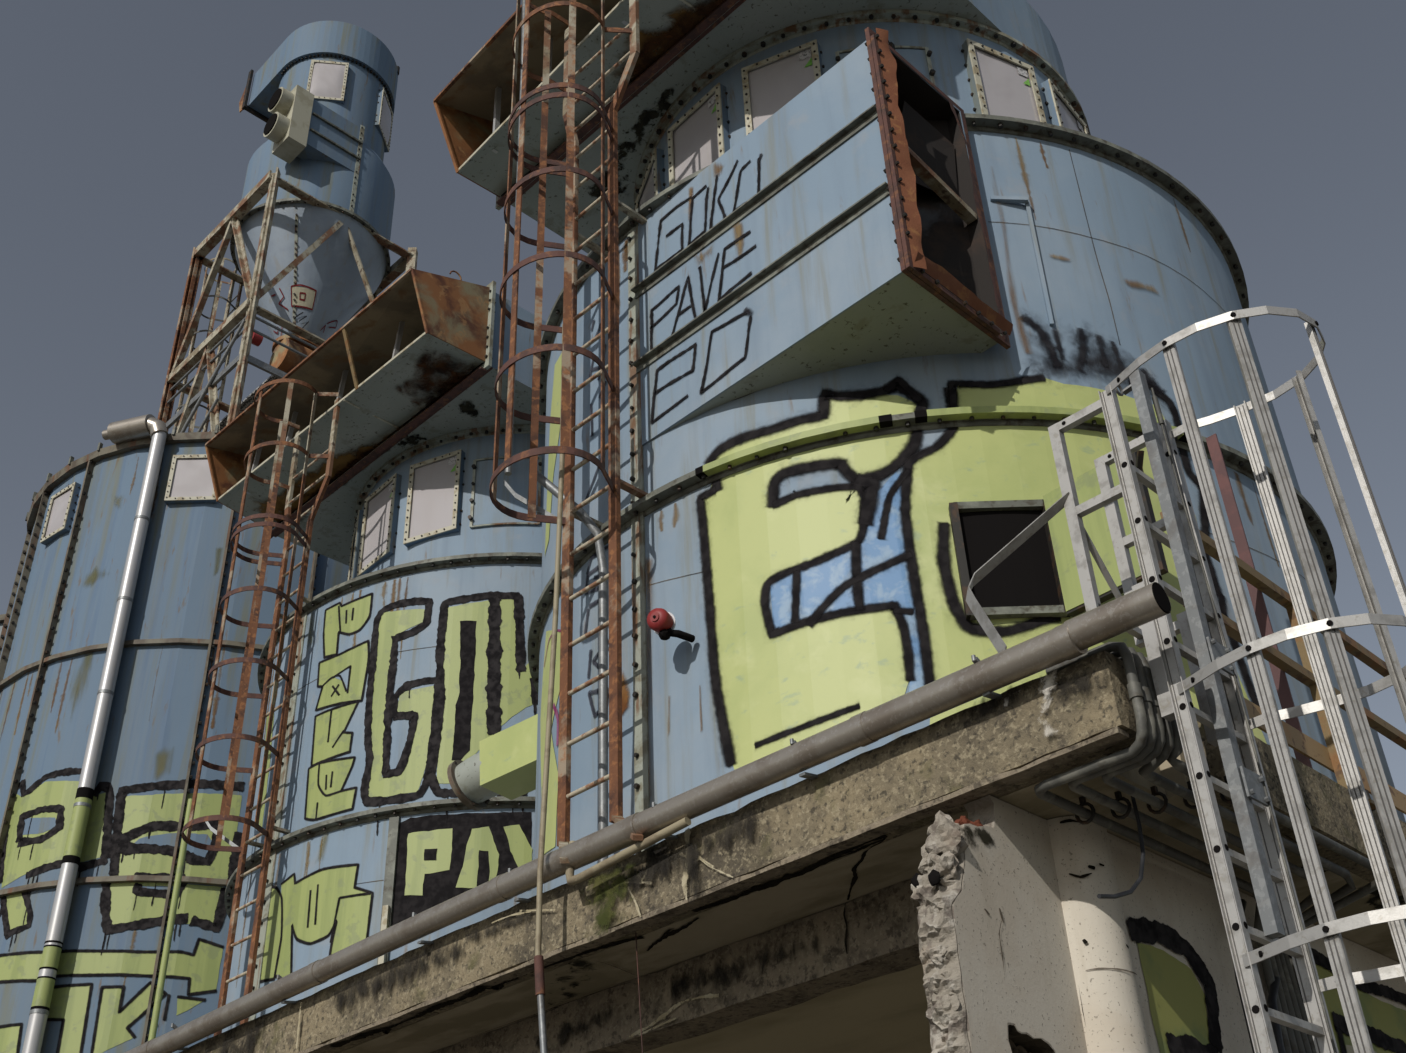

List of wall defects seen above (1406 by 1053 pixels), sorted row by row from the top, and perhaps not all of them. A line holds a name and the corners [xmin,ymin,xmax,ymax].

corrosion [614,0,725,84]
water stain [548,962,611,1047]
water stain [626,812,754,917]
water stain [671,936,818,1000]
crack [838,837,887,954]
spalling [910,810,983,1053]
spalling [1008,1023,1056,1053]